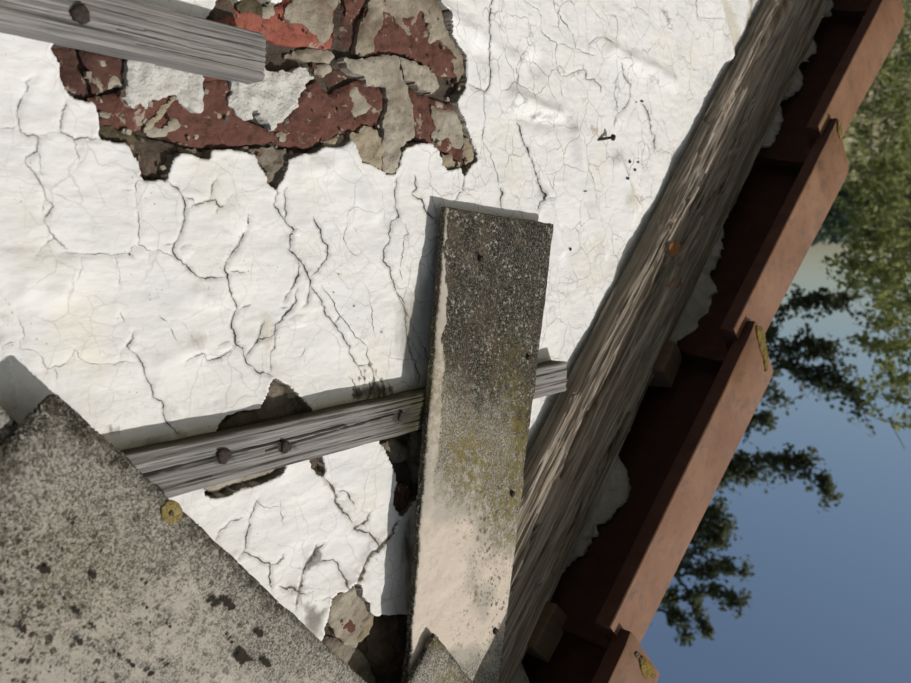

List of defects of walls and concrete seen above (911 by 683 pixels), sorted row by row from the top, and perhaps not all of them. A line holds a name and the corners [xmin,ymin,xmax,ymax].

flaking render [51,0,474,186]
crack [475,0,493,92]
crack [516,0,660,151]
crack [517,124,547,208]
crack [0,80,378,391]
crack [383,177,438,382]
crack [10,315,177,433]
flaking render [217,381,302,430]
flaking render [203,469,276,493]
crack [218,480,399,605]
flaking render [322,586,408,683]